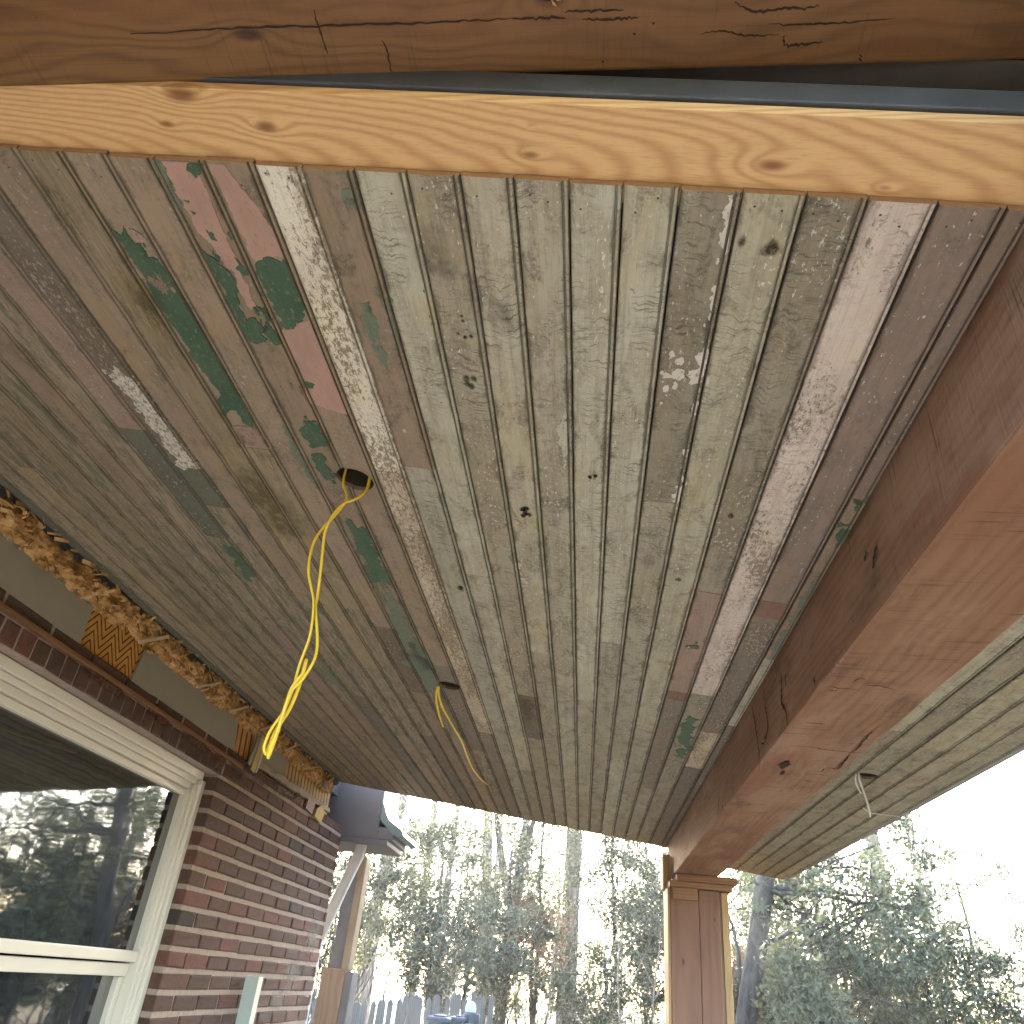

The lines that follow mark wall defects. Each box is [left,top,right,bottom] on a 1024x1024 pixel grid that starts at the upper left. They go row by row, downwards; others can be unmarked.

crack [130,8,638,73]
crack [702,2,893,48]
peeling [109,227,256,427]
peeling [144,160,349,414]
peeling [659,285,722,416]
peeling [102,366,202,471]
peeling [282,416,337,485]
peeling [672,449,689,509]
peeling [345,518,438,693]
peeling [673,715,698,759]